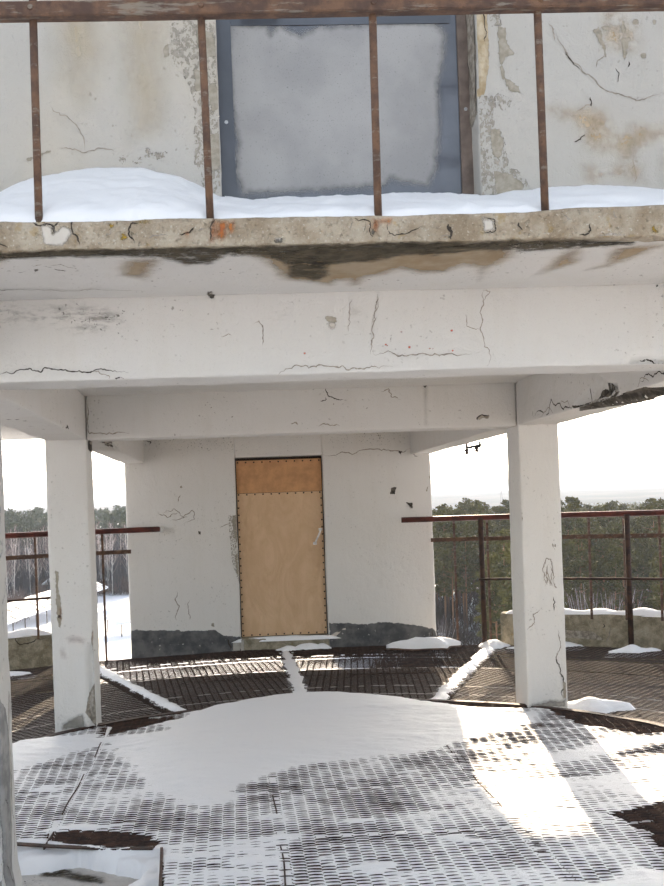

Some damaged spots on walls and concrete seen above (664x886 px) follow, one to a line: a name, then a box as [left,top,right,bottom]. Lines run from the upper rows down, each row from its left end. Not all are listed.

peeling [163,20,221,192]
peeling [477,14,529,195]
rust [210,218,233,241]
damp [0,240,653,283]
crack [278,295,464,375]
crack [466,290,491,366]
crack [2,367,127,384]
spalling [572,383,664,411]